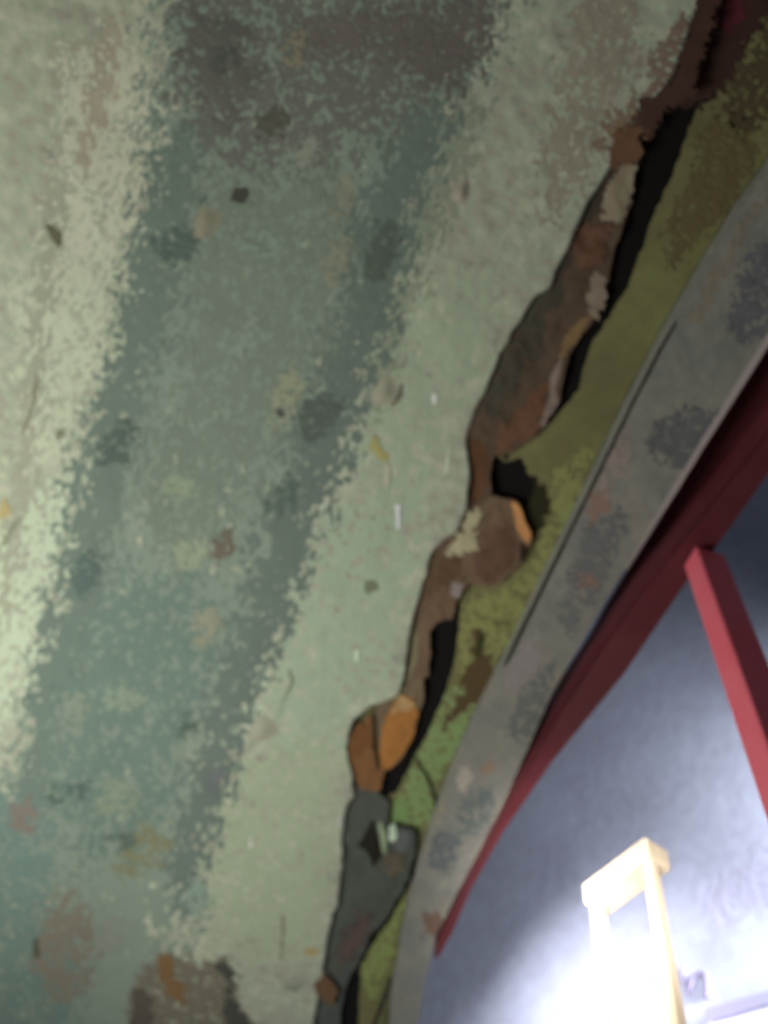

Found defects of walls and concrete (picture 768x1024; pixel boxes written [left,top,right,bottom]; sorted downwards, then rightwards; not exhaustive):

rust [558,315,591,358]
rust [468,435,489,506]
leakage [0,0,536,1024]
spalling [313,160,638,1024]
rust [349,694,419,769]